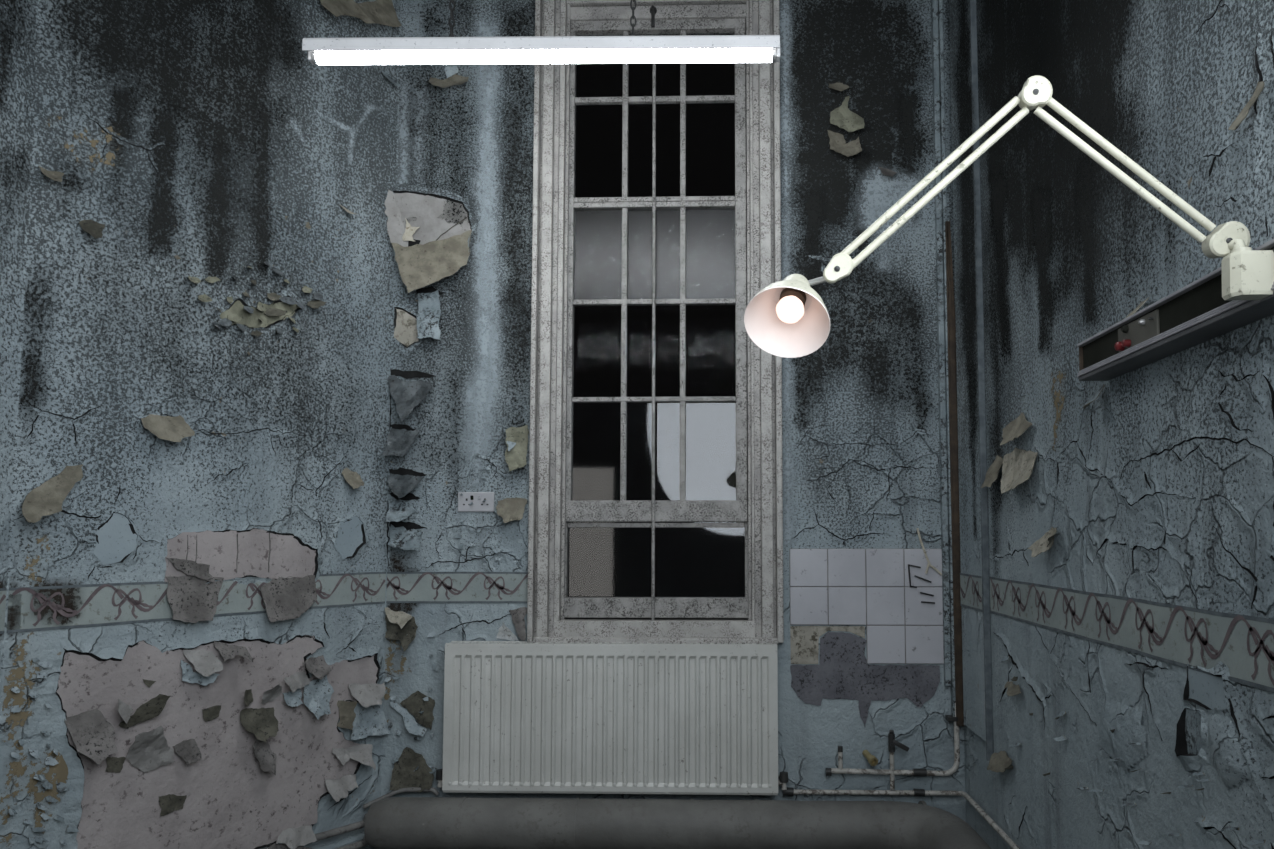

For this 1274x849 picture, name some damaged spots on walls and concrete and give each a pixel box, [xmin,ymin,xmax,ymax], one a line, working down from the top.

crack [1189,0,1274,237]
peeling [188,261,327,338]
water stain [0,0,535,502]
peeling [384,183,479,356]
water stain [779,0,935,546]
water stain [954,0,1206,577]
peeling [382,369,435,551]
crack [1039,352,1274,610]
flaking render [0,503,437,849]
peeling [790,626,940,726]
crack [1125,653,1169,741]
crack [1195,696,1274,849]